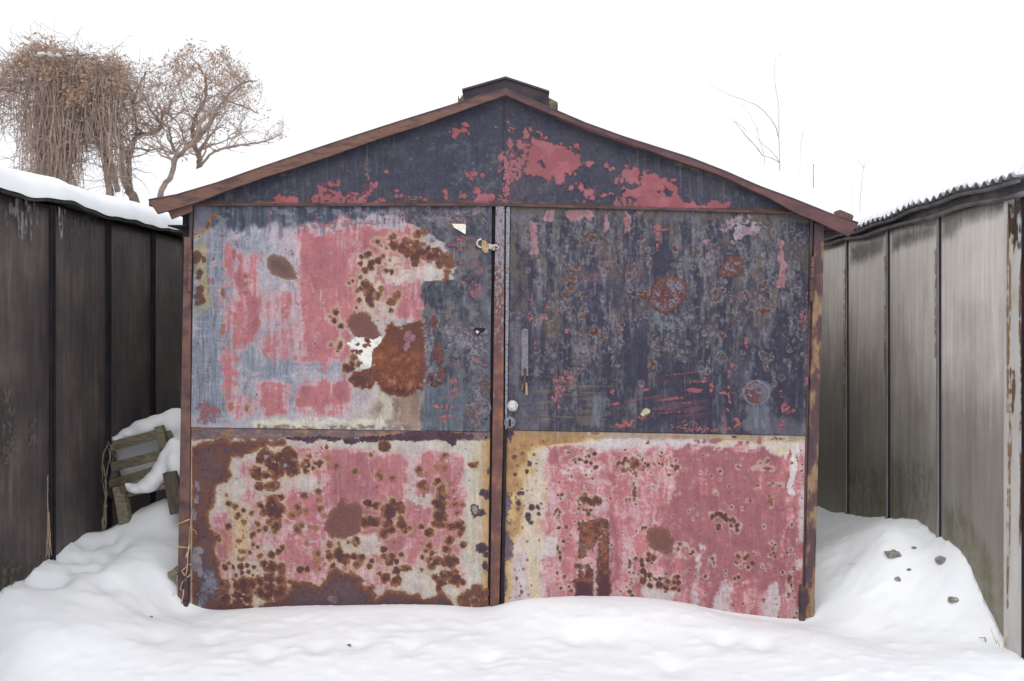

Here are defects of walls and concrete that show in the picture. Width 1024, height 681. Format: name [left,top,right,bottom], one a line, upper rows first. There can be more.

peeling [270,169,427,229]
peeling [443,120,765,245]
peeling [347,336,382,370]
rust [329,229,455,397]
peeling [402,330,416,352]
rust [551,232,727,374]
peeling [195,401,220,424]
peeling [433,379,461,423]
rust [192,431,489,610]
rust [515,490,541,525]
rust [554,492,681,597]
rust [616,455,679,501]